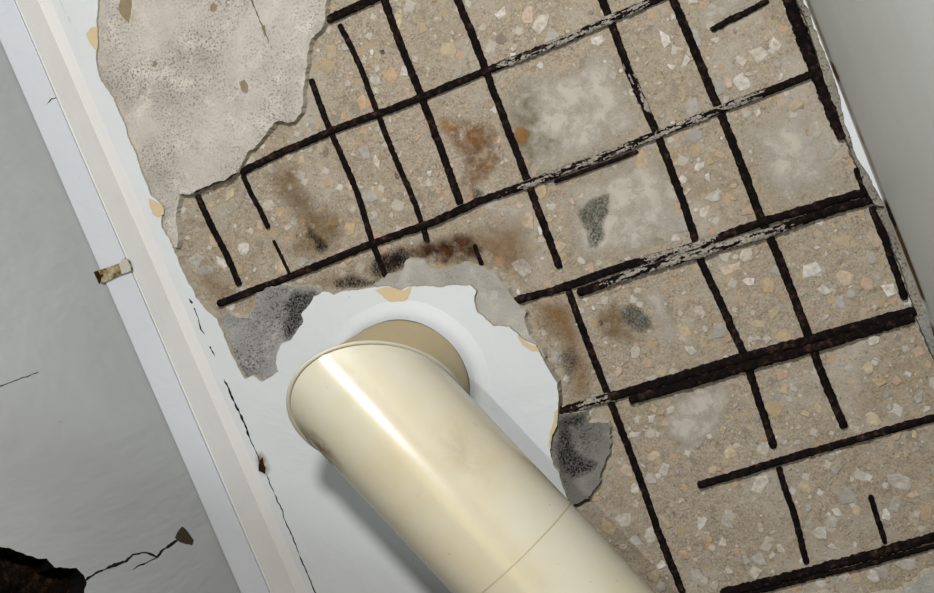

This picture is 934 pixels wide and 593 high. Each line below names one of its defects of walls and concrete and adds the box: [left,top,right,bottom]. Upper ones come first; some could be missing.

rust [444,123,491,181]
spalling [86,0,812,407]
water stain [573,161,674,253]
water stain [284,292,316,338]
water stain [336,249,409,287]
spalling [514,0,934,593]
rust [884,199,924,299]
water stain [558,416,596,477]
crack [224,380,316,593]
spalling [0,558,70,593]
crack [85,527,194,581]